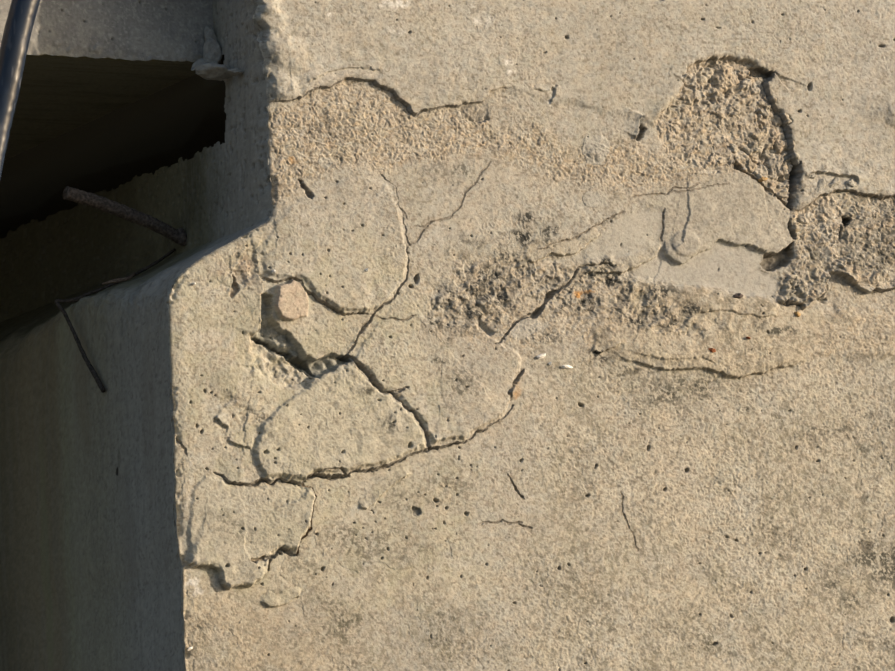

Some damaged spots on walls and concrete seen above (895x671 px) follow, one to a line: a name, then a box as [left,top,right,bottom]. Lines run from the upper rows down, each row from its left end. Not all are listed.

spalling [272,58,895,306]
crack [213,161,533,571]
spalling [510,318,547,339]
peeling [594,340,810,378]